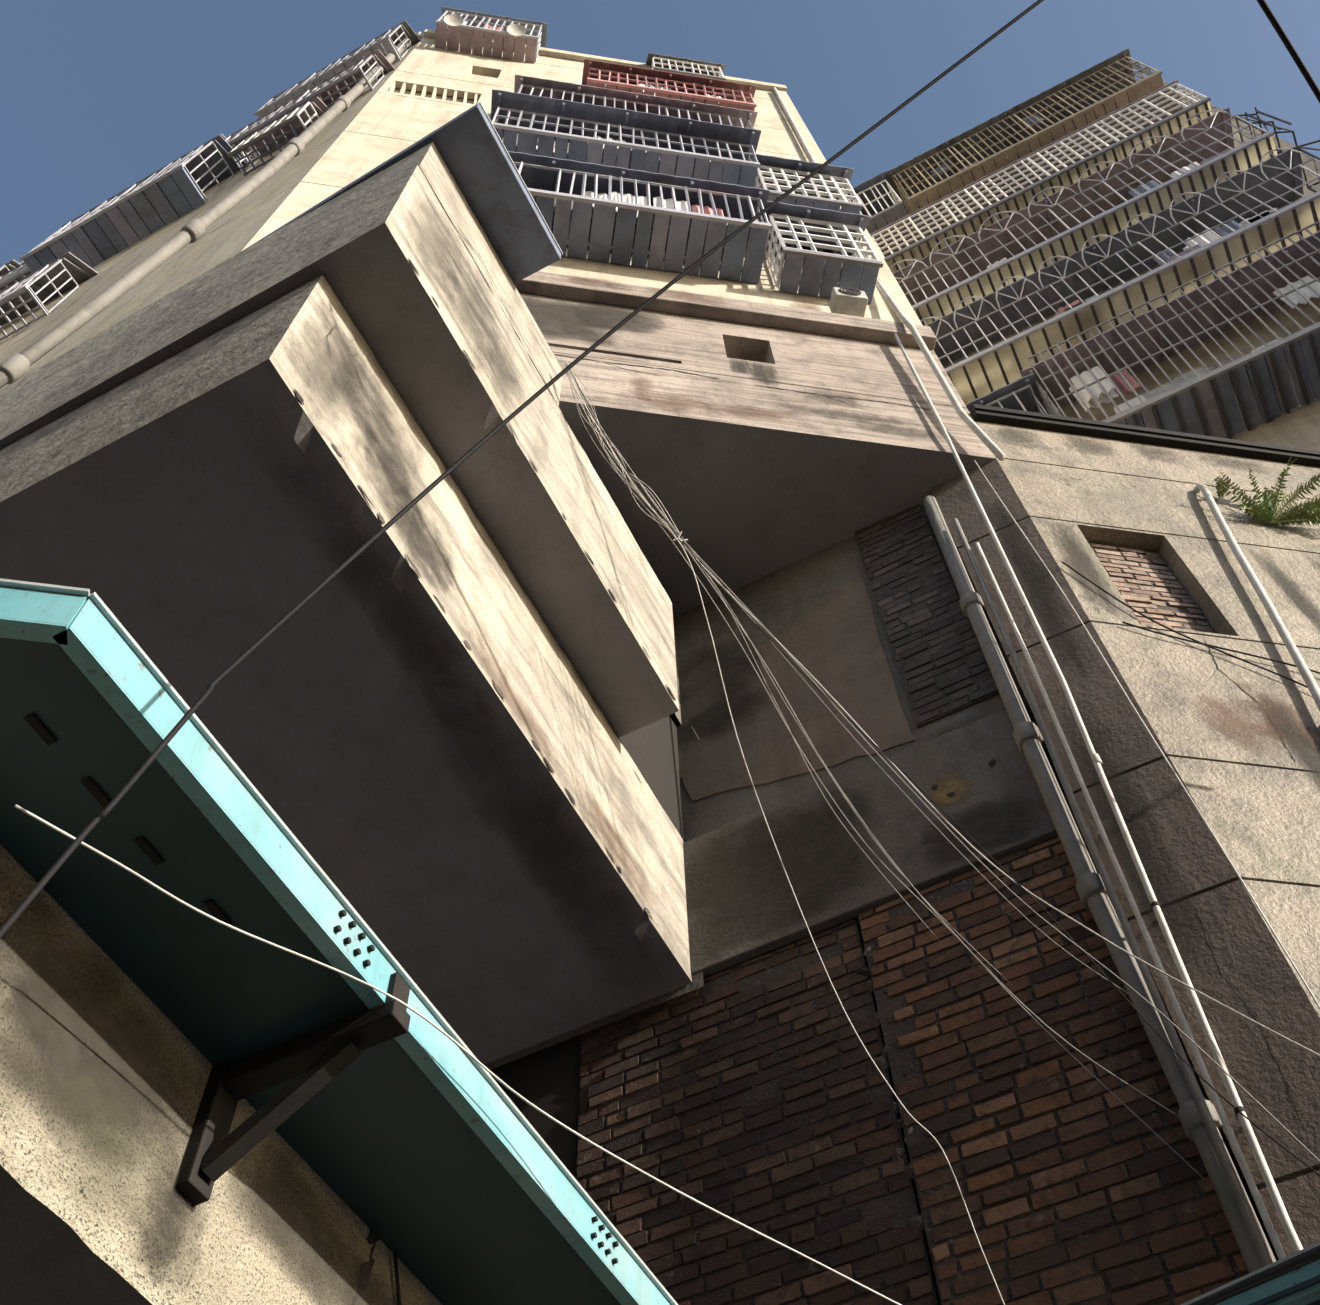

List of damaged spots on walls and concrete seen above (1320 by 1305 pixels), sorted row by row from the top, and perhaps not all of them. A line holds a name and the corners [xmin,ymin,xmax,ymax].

crack [1193,907,1308,1138]